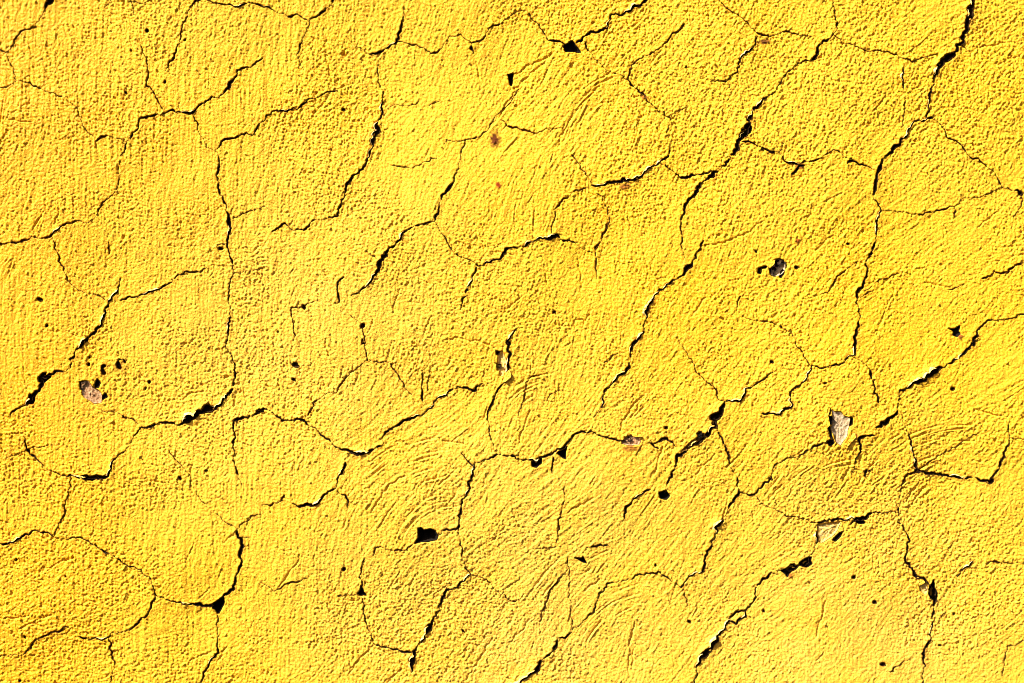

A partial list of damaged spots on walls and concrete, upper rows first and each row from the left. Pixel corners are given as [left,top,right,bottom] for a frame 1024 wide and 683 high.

crack [0,0,337,434]
spalling [758,259,798,278]
crack [275,0,1024,683]
spalling [80,356,126,403]
spalling [622,434,642,445]
spalling [821,408,856,447]
crack [0,316,628,683]
spalling [415,528,438,543]
spalling [818,522,843,543]